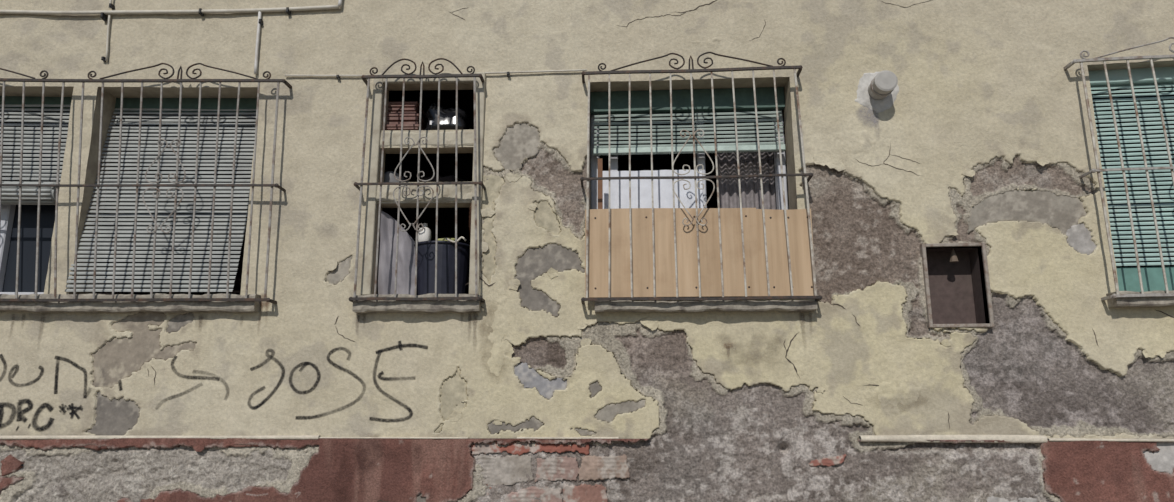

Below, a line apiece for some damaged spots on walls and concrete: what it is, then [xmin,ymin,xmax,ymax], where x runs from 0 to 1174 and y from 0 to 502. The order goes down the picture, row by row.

crack [617,0,716,27]
spalling [480,123,587,317]
spalling [0,312,319,502]
peeling [434,367,468,433]
spalling [457,154,1174,502]